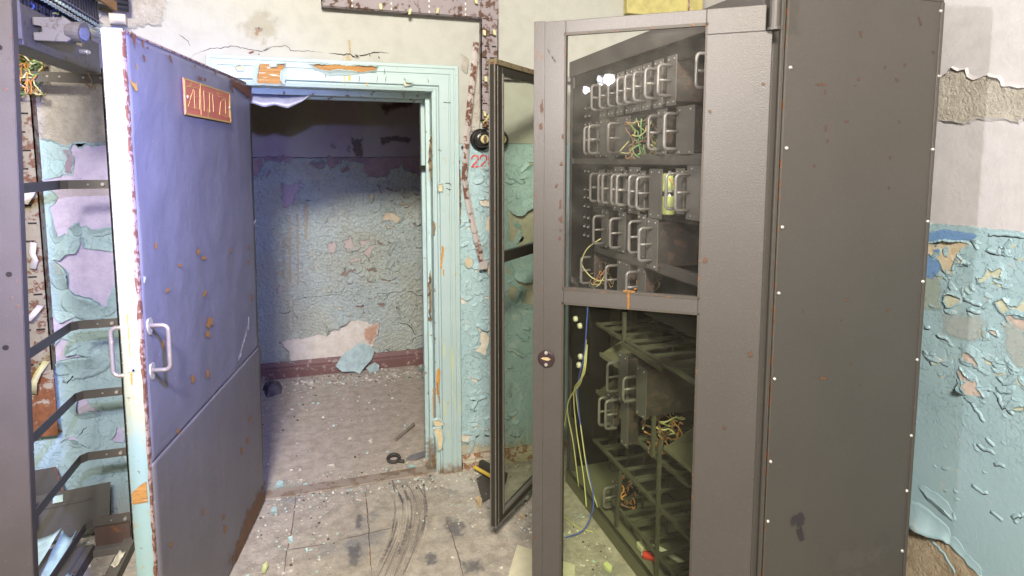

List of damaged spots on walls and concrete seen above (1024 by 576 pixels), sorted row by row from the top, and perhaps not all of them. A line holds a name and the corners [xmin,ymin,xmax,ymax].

crack [182,36,386,82]
peeling [308,54,378,76]
flaking render [937,65,1024,125]
peeling [34,0,168,419]
flaking render [279,155,422,364]
peeling [460,163,490,454]
peeling [504,160,534,312]
peeling [922,238,1024,426]
flaking render [906,485,983,576]